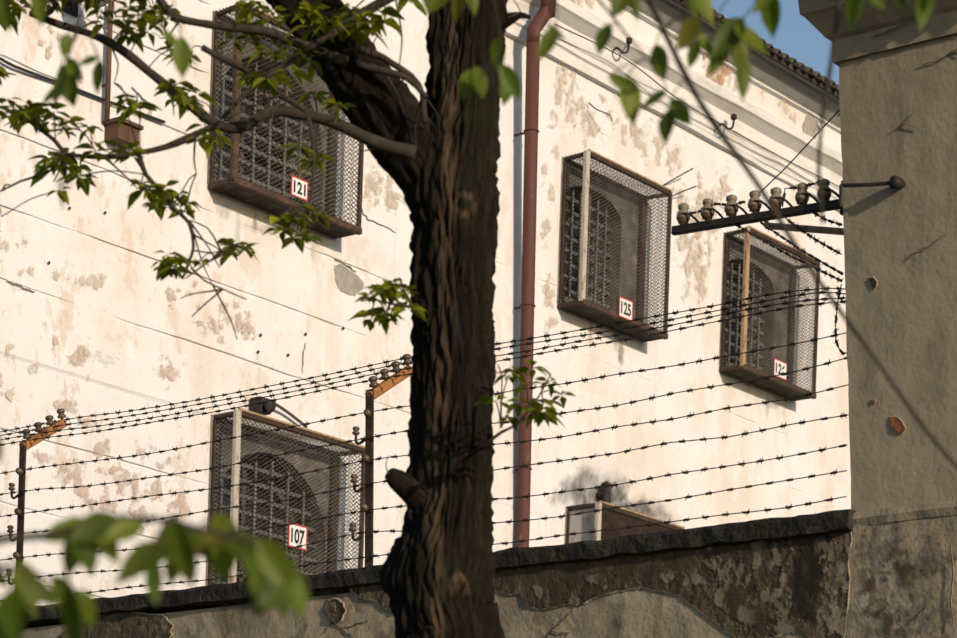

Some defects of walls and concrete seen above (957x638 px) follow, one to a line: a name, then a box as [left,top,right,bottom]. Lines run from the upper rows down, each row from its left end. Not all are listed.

peeling [548,65,601,146]
peeling [602,95,681,174]
peeling [54,271,106,289]
peeling [197,301,255,342]
peeling [70,344,113,365]
peeling [160,361,174,381]
spalling [889,416,906,435]
spalling [493,523,957,638]